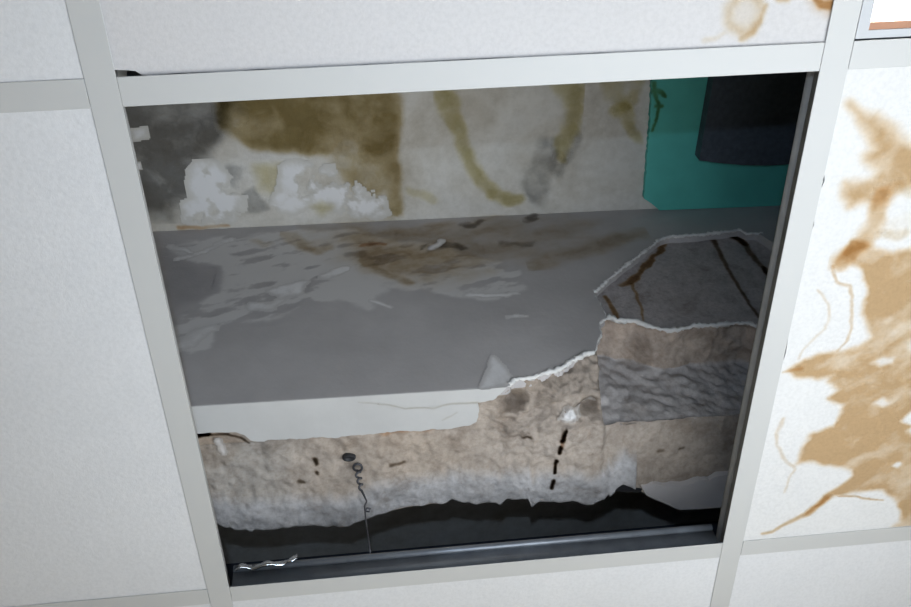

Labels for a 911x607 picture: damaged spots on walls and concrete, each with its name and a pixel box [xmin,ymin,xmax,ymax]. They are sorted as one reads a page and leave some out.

water stain [222,96,329,151]
peeling [125,106,534,360]
spalling [197,228,772,532]